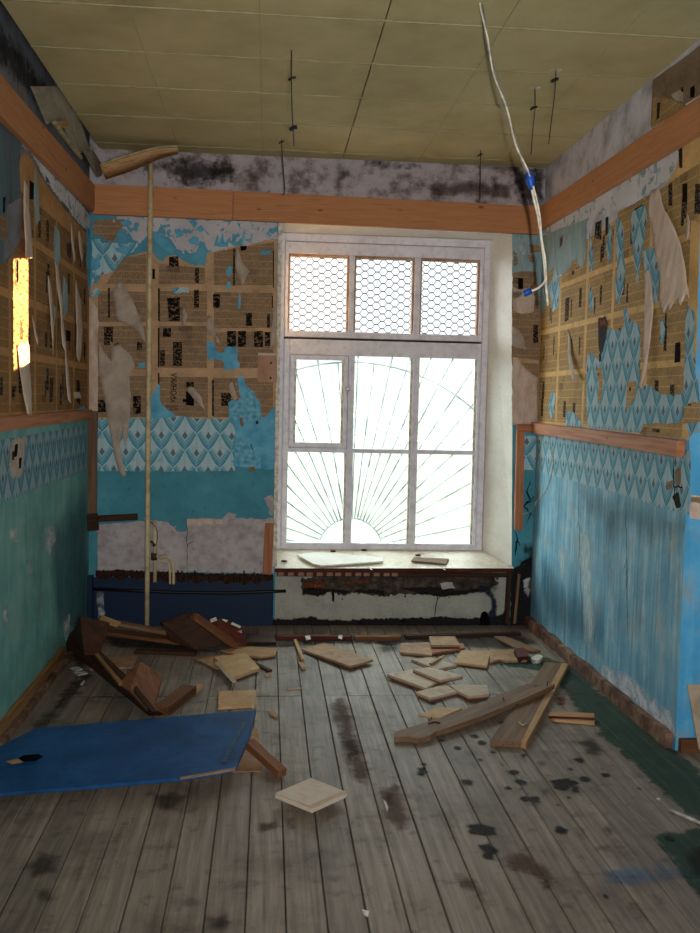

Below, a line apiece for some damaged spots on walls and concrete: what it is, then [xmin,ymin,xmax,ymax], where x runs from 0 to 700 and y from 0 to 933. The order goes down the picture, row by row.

mould [0,27,45,93]
peeling [0,122,90,264]
mould [145,159,234,185]
leakage [431,170,545,205]
peeling [113,216,278,254]
peeling [512,149,680,315]
flaking render [96,495,274,573]
crack [515,481,534,555]
spalling [301,576,499,602]
hole [480,611,490,626]